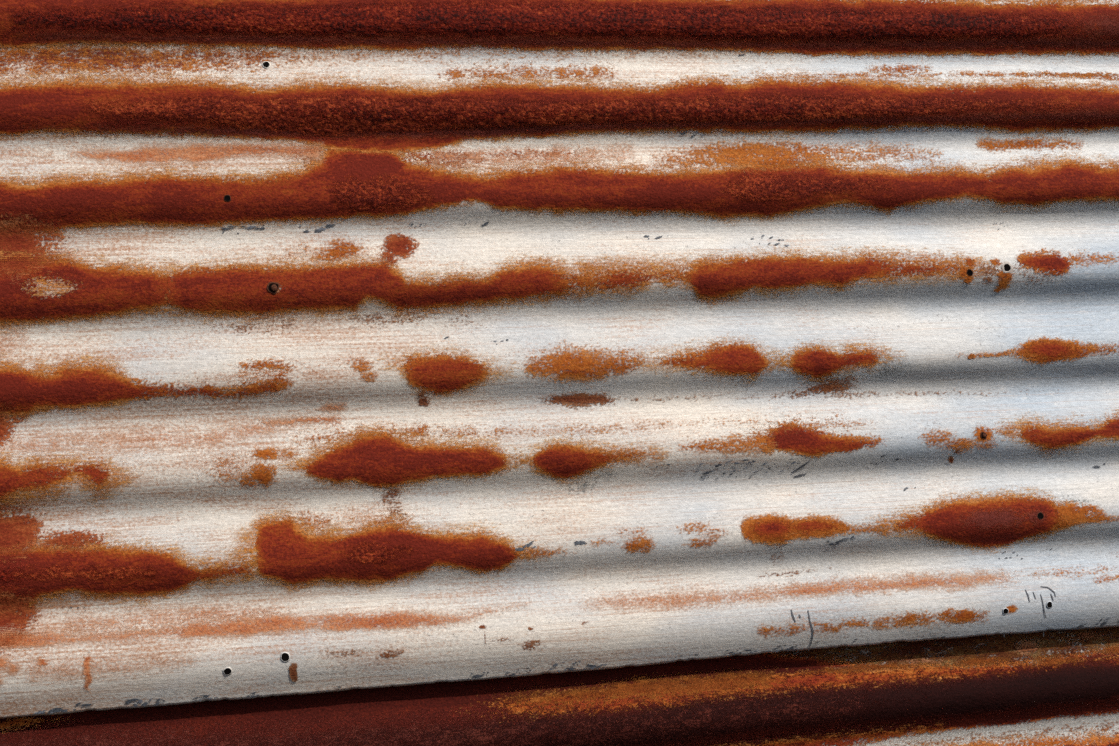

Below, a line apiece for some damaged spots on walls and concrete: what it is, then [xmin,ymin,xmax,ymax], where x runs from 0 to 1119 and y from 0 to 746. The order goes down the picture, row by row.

corrosion [0,0,1119,354]
corrosion [348,338,910,409]
corrosion [958,337,1119,367]
corrosion [679,413,884,458]
corrosion [922,409,1119,463]
corrosion [0,355,668,690]
corrosion [586,488,1119,610]
corrosion [0,608,1119,746]